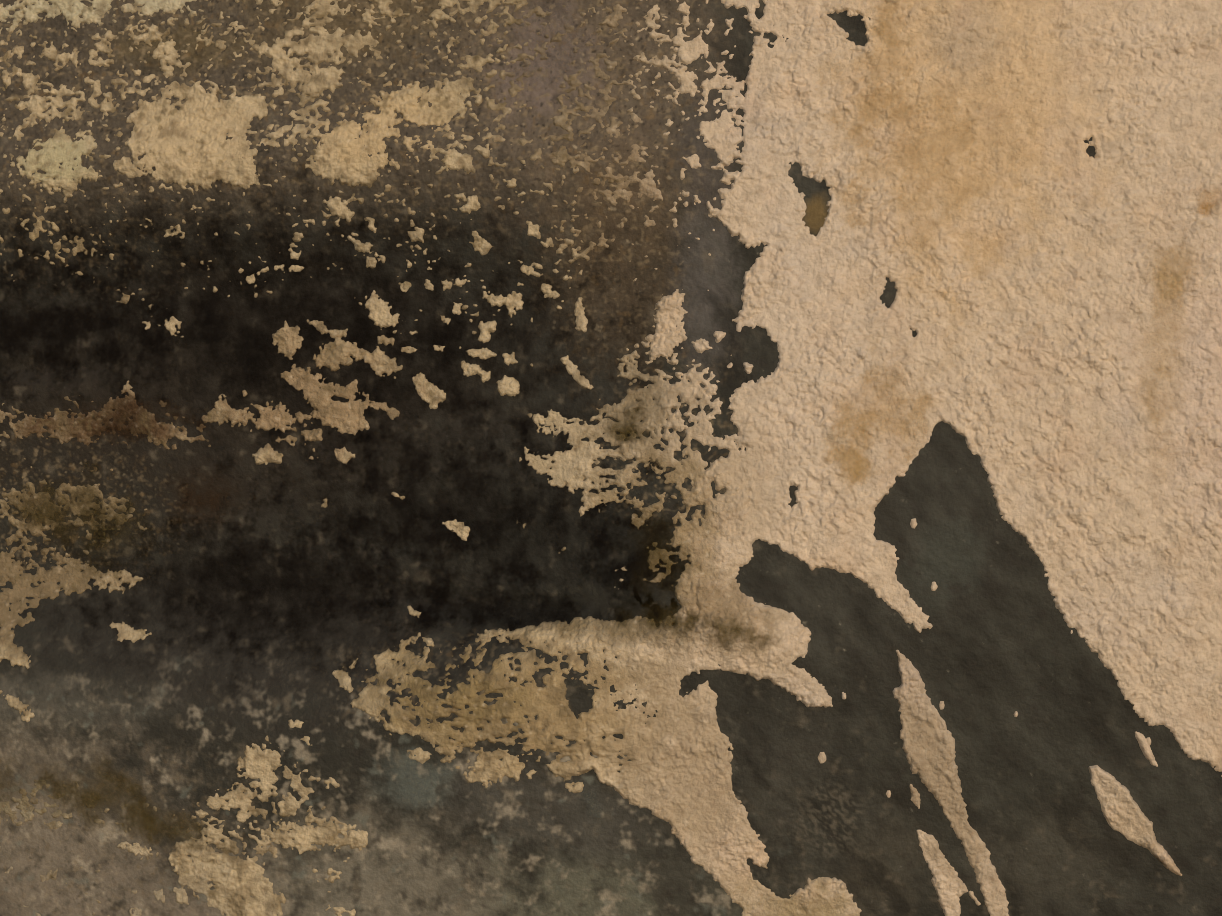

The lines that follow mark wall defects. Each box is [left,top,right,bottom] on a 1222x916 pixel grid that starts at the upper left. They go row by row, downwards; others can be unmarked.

peeling [827,10,871,46]
peeling [788,162,831,236]
damp [140,219,487,418]
peeling [0,0,789,916]
damp [341,458,568,560]
damp [581,489,674,590]
damp [167,542,390,655]
damp [450,597,577,631]
damp [648,609,698,627]
flaking render [679,421,1222,916]